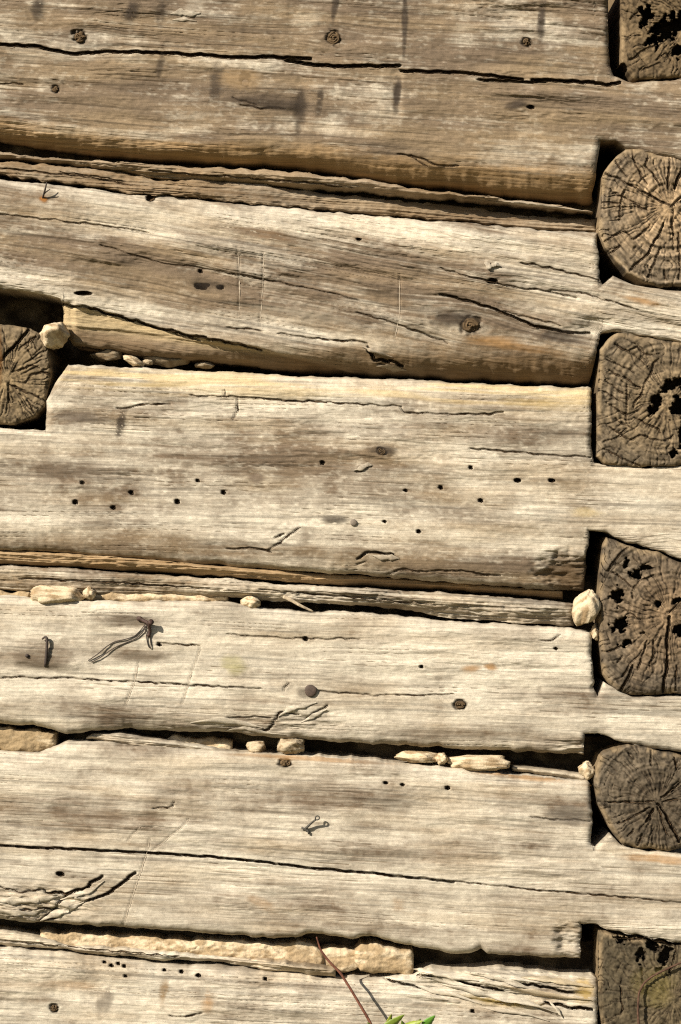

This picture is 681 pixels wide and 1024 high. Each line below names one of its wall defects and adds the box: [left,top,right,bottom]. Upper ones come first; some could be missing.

crack [0,12,671,87]
crack [441,263,634,334]
crack [62,303,402,366]
crack [227,527,300,552]
crack [233,683,449,731]
crack [0,845,681,957]